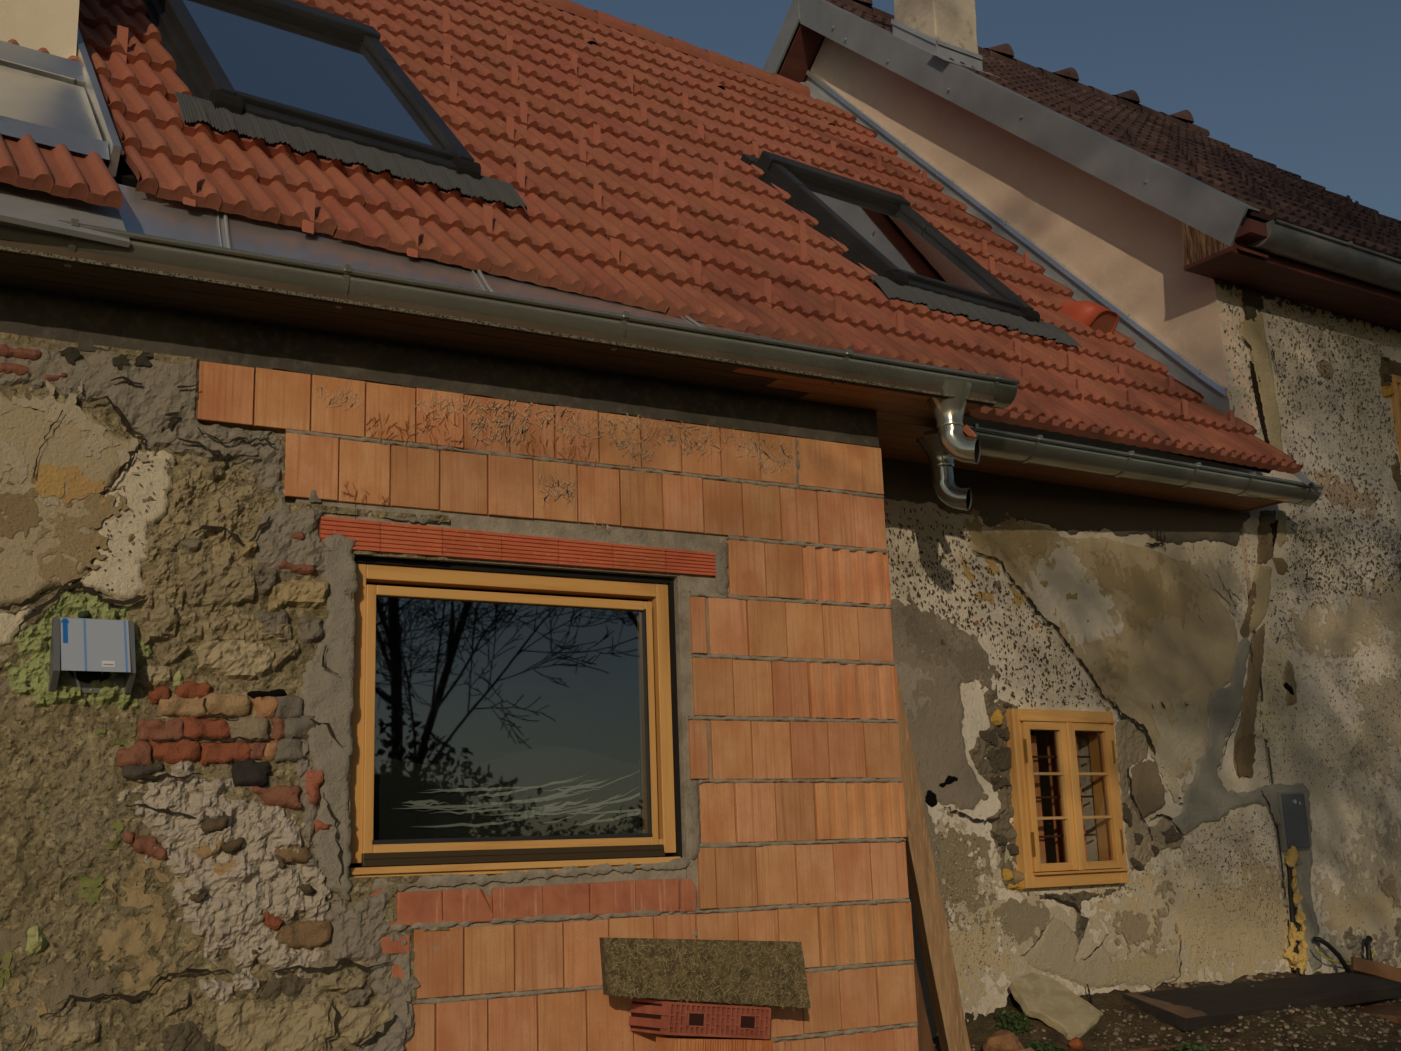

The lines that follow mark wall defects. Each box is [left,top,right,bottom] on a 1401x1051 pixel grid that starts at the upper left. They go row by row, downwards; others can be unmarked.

spalling [1379,356,1401,387]
spalling [1391,456,1401,492]
spalling [0,344,331,869]
peeling [1023,540,1124,655]
crack [973,550,1188,841]
spalling [194,812,244,887]
flaking render [263,911,332,950]
spalling [298,884,316,896]
spalling [969,689,1122,945]
peeling [1115,698,1207,871]
spalling [162,969,391,1051]
spalling [965,993,1020,1023]